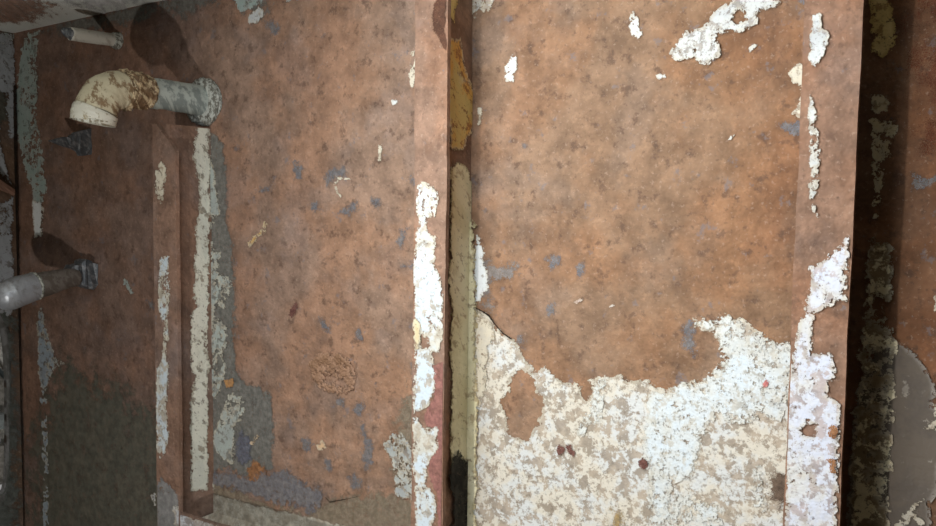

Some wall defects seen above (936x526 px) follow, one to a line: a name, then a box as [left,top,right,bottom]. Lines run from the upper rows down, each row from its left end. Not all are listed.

rust [0,0,59,26]
peeling [235,0,262,12]
peeling [472,0,494,18]
peeling [669,0,781,65]
peeling [450,37,473,151]
peeling [808,97,821,216]
peeling [868,117,898,219]
peeling [156,256,170,459]
peeling [189,128,245,491]
peeling [381,162,936,526]
peeling [172,505,213,526]